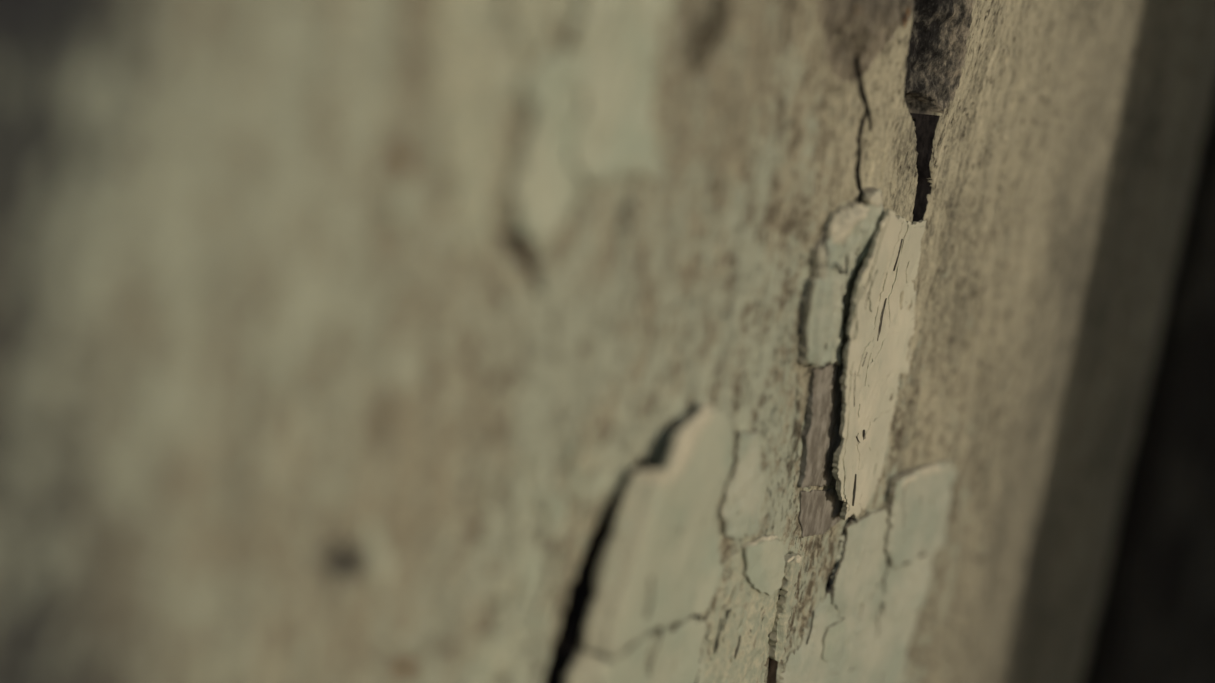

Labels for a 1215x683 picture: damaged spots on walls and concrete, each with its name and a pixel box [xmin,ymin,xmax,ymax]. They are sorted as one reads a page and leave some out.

crack [853,44,872,203]
crack [910,113,940,222]
peeling [563,187,958,683]
crack [544,457,644,683]